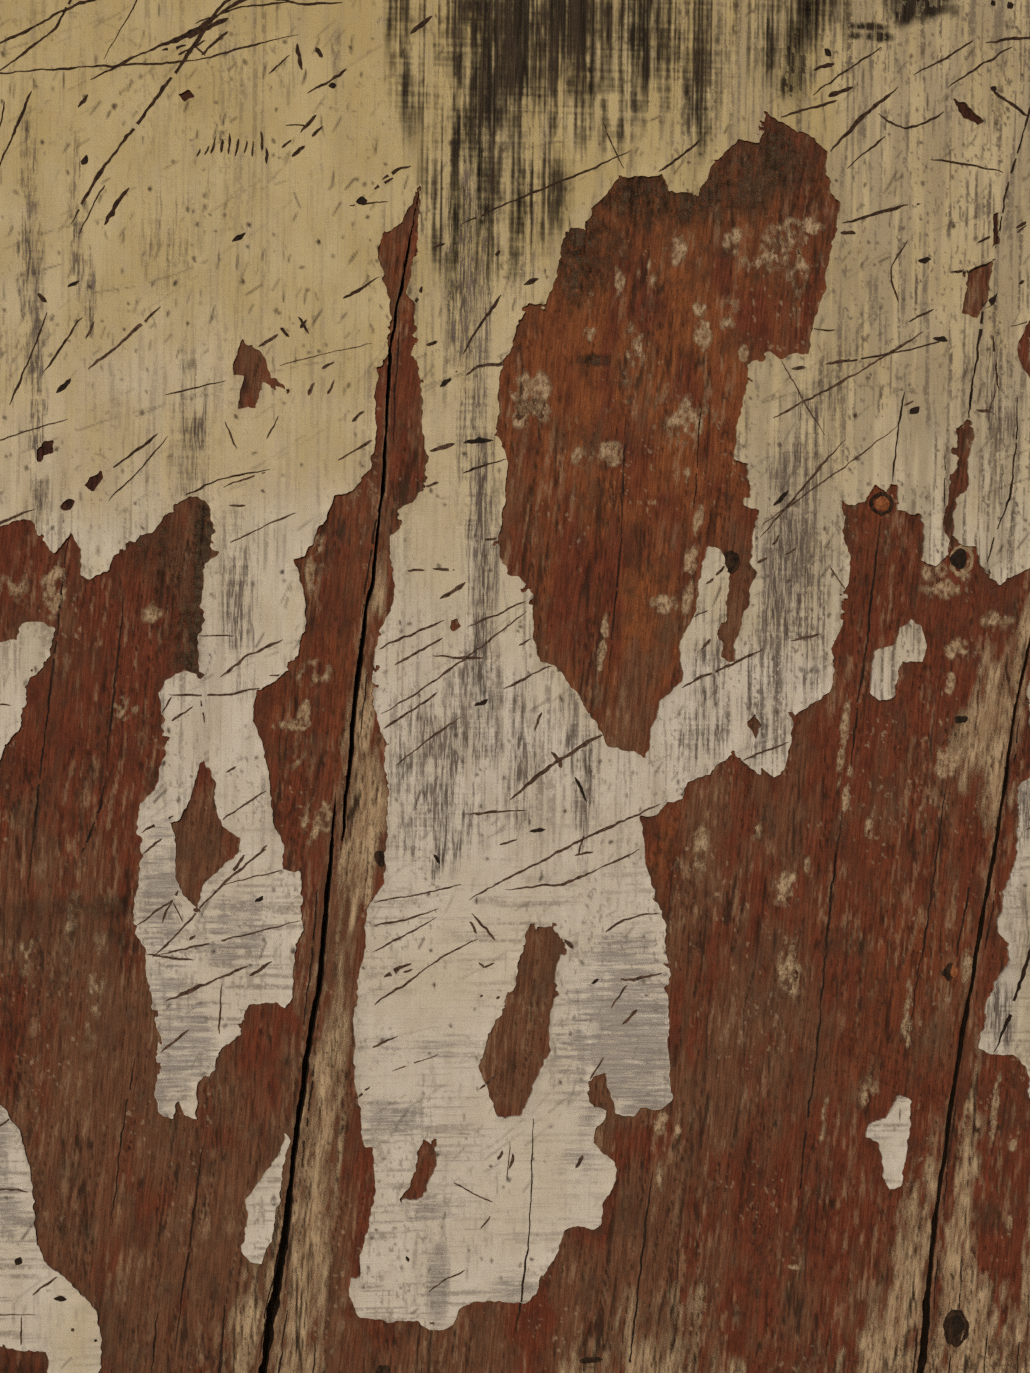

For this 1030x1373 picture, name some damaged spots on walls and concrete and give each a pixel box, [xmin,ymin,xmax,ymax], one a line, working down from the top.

peeling [233,339,290,409]
peeling [354,186,429,853]
peeling [492,112,839,758]
peeling [962,213,999,318]
peeling [1017,320,1030,377]
crack [81,597,124,853]
crack [258,193,419,1373]
peeling [0,355,1030,1373]
crack [910,638,1030,1373]
crack [111,1058,135,1226]
crack [151,1147,225,1373]